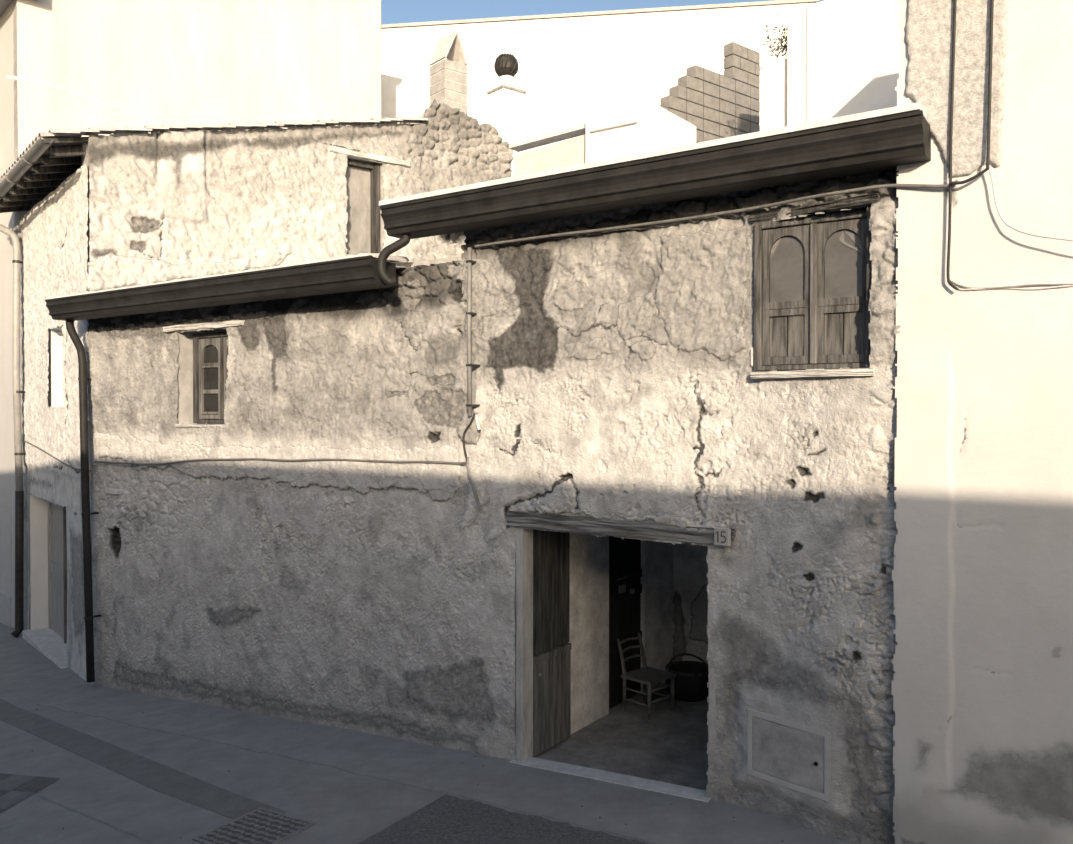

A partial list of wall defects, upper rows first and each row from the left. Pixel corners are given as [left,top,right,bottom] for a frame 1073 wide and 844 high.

spalling [130,217,160,252]
spalling [439,183,795,244]
flaking render [447,258,508,331]
flaking render [564,227,754,367]
spalling [385,373,467,443]
crack [694,384,722,510]
crack [514,479,580,509]
leakage [962,751,1073,820]